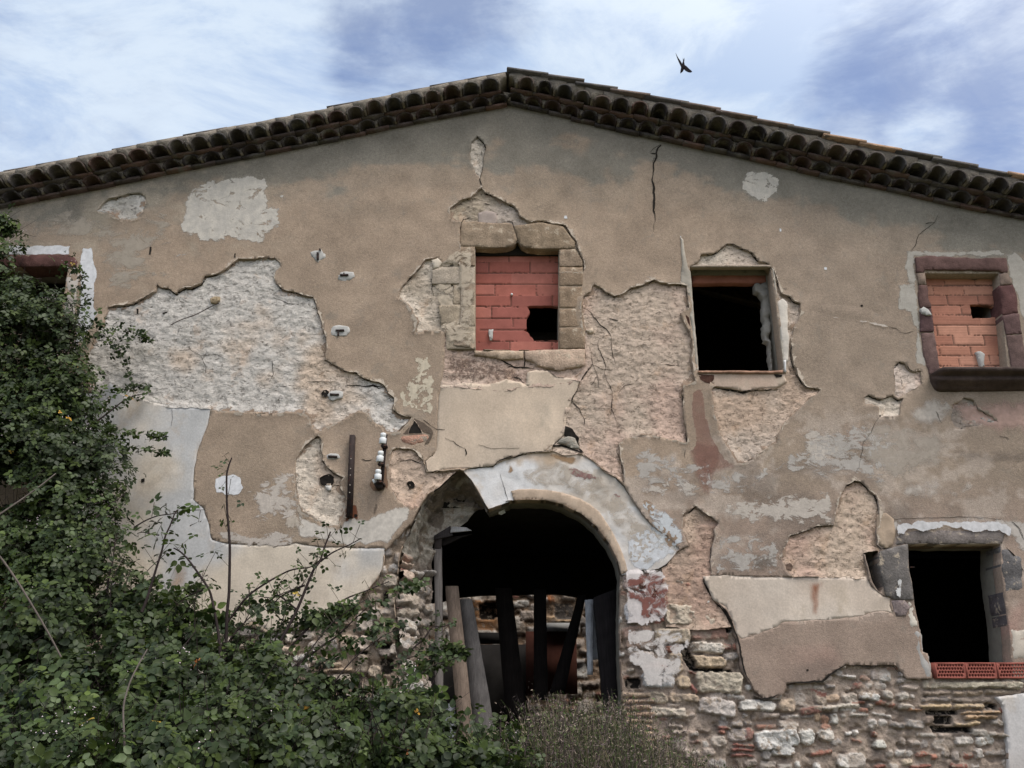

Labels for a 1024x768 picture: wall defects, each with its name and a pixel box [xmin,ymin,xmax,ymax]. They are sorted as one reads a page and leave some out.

crack [651,145,661,232]
crack [501,305,632,424]
flaking render [48,137,1024,768]